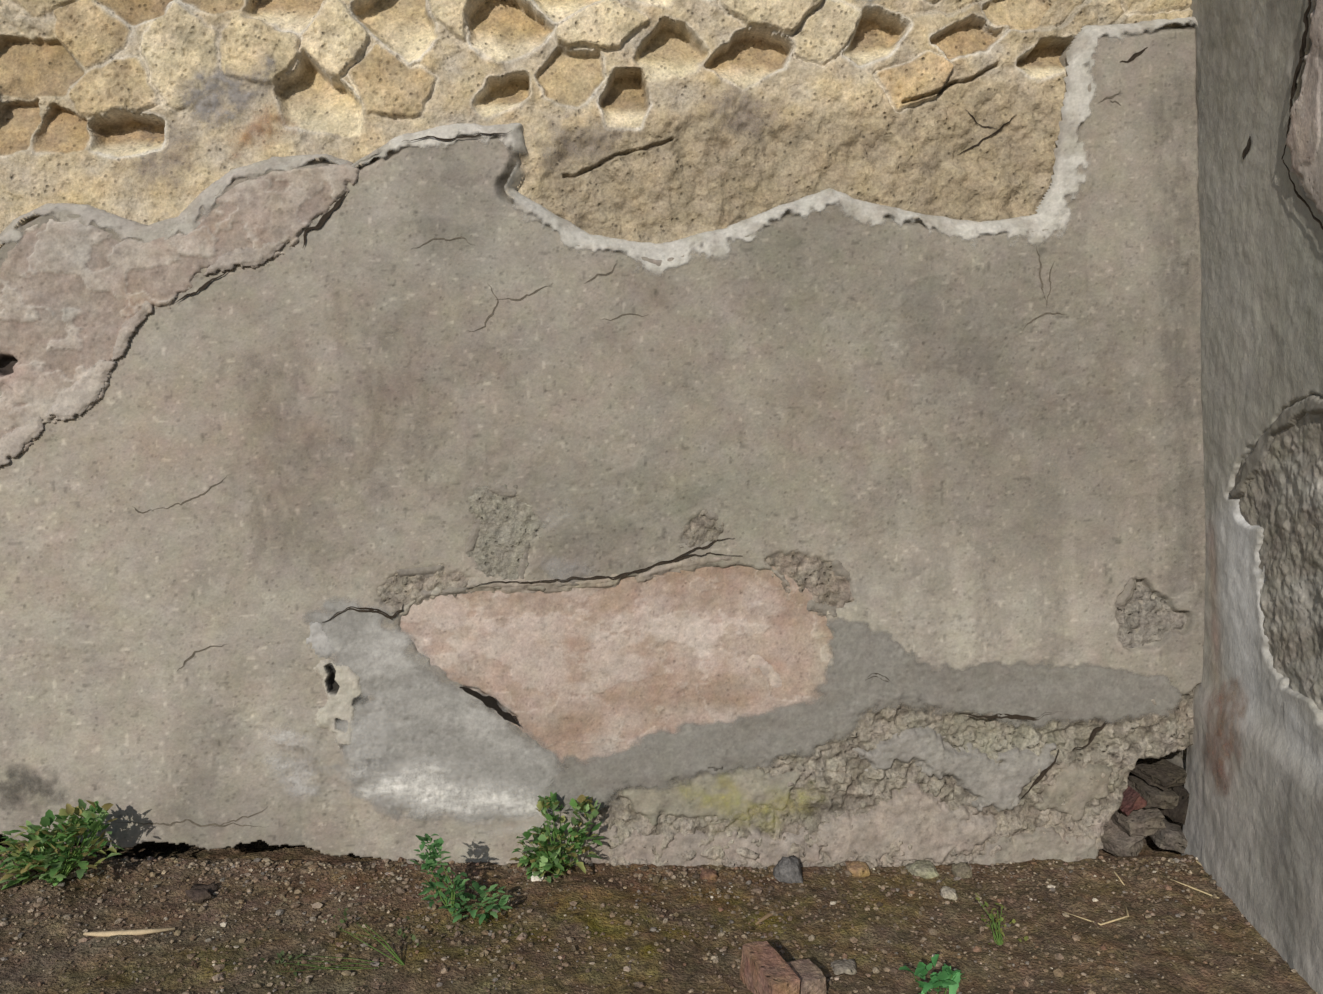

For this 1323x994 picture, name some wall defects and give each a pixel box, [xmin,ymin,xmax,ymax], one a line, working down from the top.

peeling [1285,0,1323,216]
peeling [0,162,361,467]
crack [116,809,269,827]
peeling [306,621,363,750]
crack [460,687,520,727]
crack [470,538,741,588]
spalling [377,482,854,764]
spalling [584,686,1196,869]
spalling [1115,578,1187,648]
spalling [1229,394,1323,710]